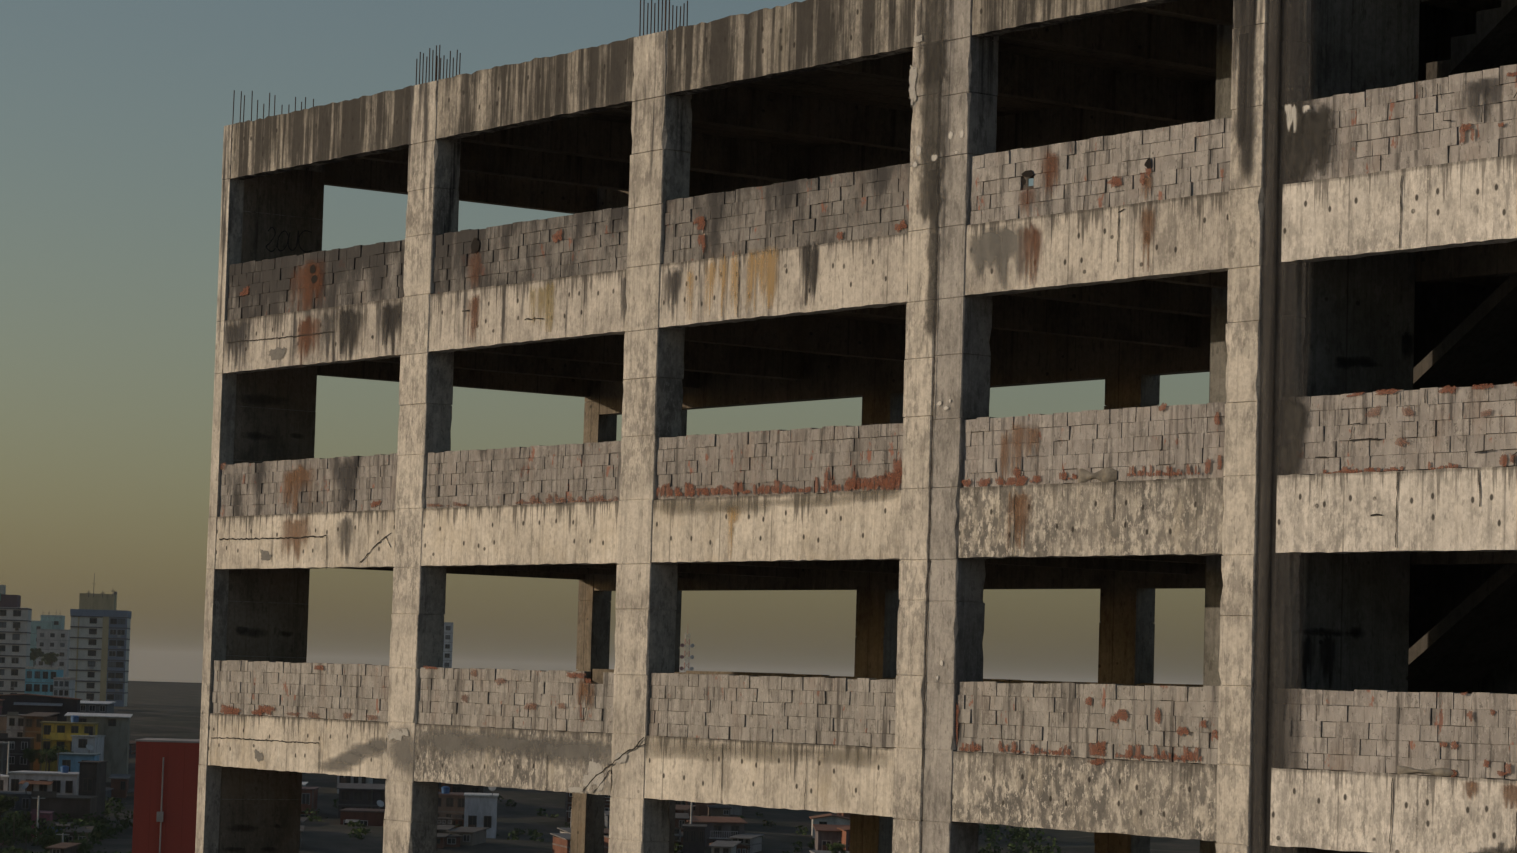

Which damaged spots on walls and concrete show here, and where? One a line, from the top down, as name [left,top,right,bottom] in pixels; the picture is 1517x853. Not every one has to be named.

leakage [912,0,964,335]
leakage [971,228,1024,288]
corrosion [1021,190,1039,275]
corrosion [1142,177,1152,265]
corrosion [298,261,319,358]
corrosion [1001,426,1036,480]
leakage [1232,0,1362,853]
corrosion [285,465,309,557]
crack [583,737,646,793]
leakage [1480,842,1517,853]